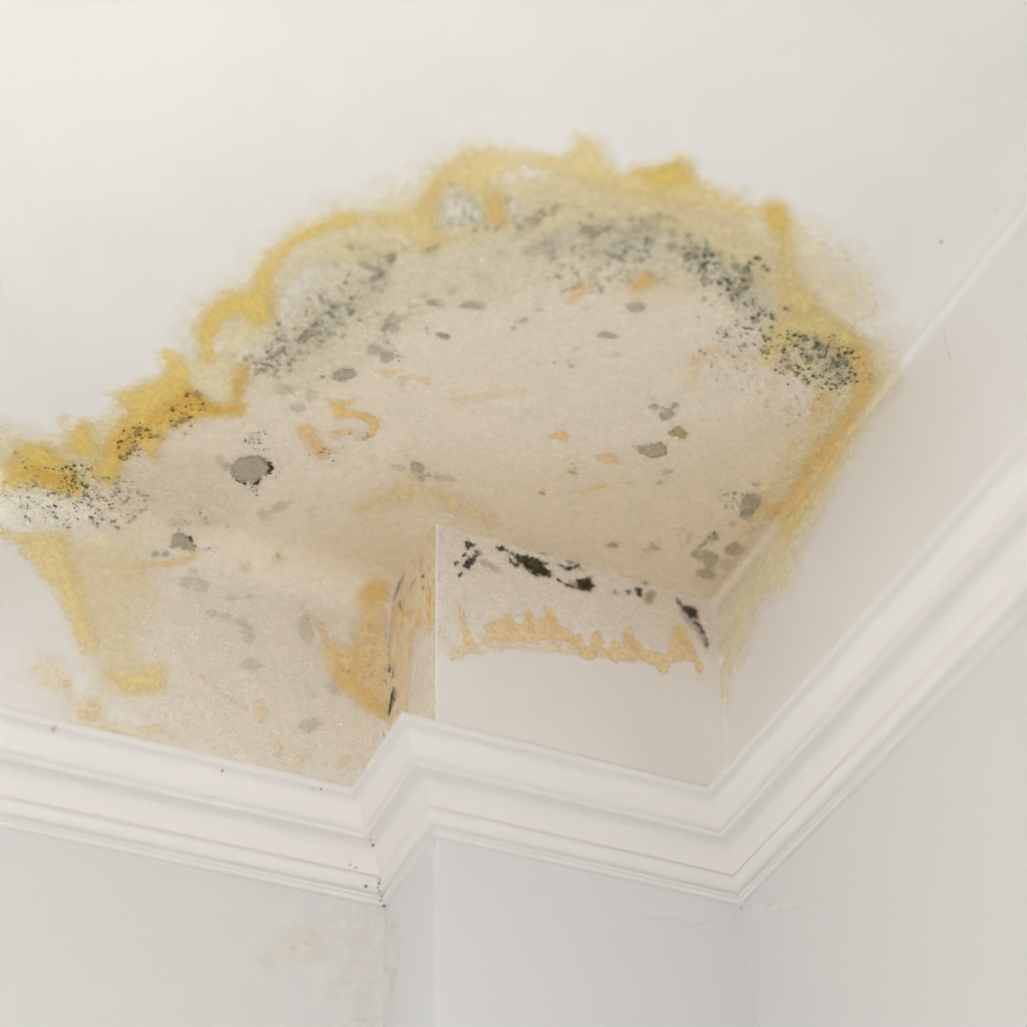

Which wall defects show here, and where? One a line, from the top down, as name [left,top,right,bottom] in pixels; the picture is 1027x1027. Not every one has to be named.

leakage [0,140,881,731]